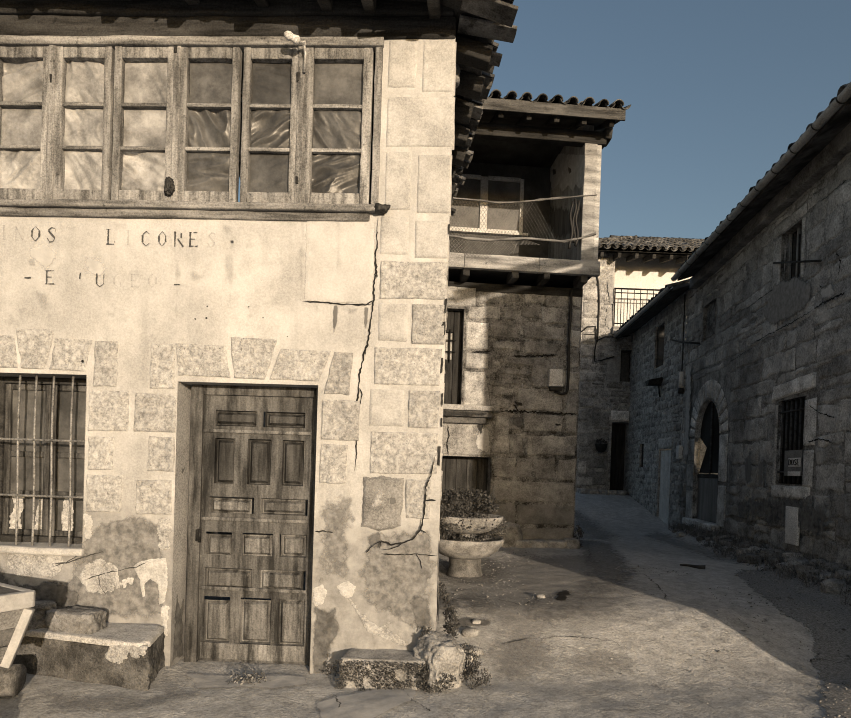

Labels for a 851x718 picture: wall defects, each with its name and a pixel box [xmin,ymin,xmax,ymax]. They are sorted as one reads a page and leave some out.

crack [302,223,378,404]
crack [366,427,450,569]
spalling [6,513,172,636]
flaking render [313,584,327,606]
water stain [313,607,339,674]
spalling [320,499,439,646]